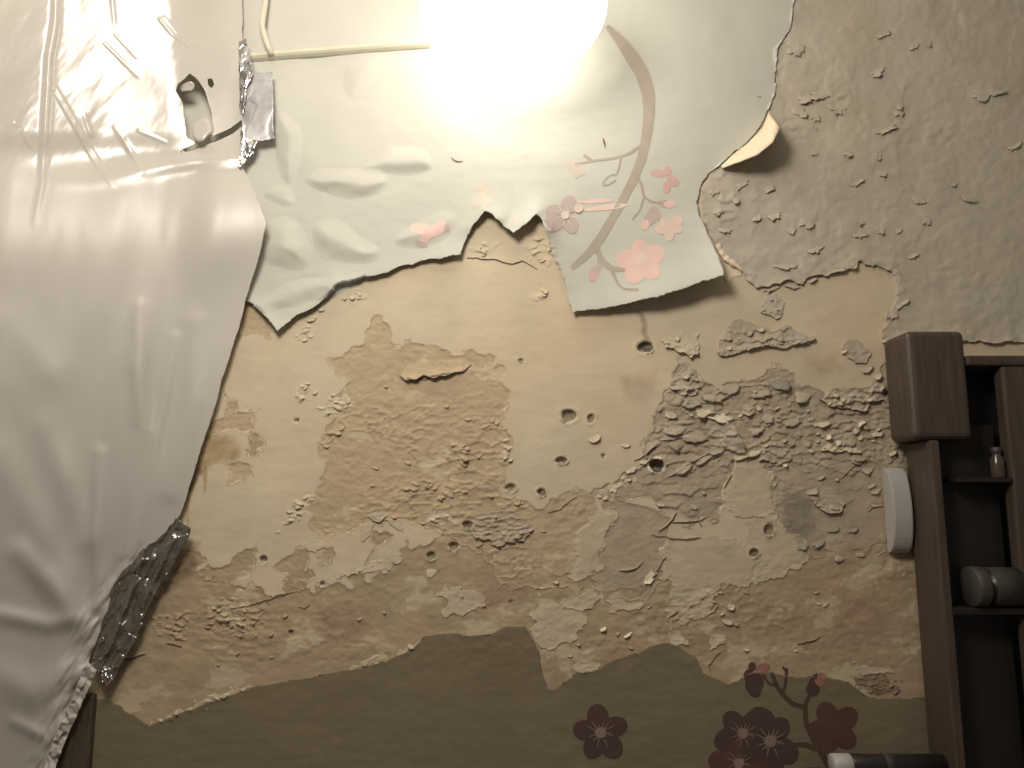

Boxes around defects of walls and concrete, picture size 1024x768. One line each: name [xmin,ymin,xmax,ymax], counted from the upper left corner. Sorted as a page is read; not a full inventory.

spalling [237,302,277,340]
spalling [293,306,324,342]
peeling [700,0,1024,356]
spalling [96,314,925,726]